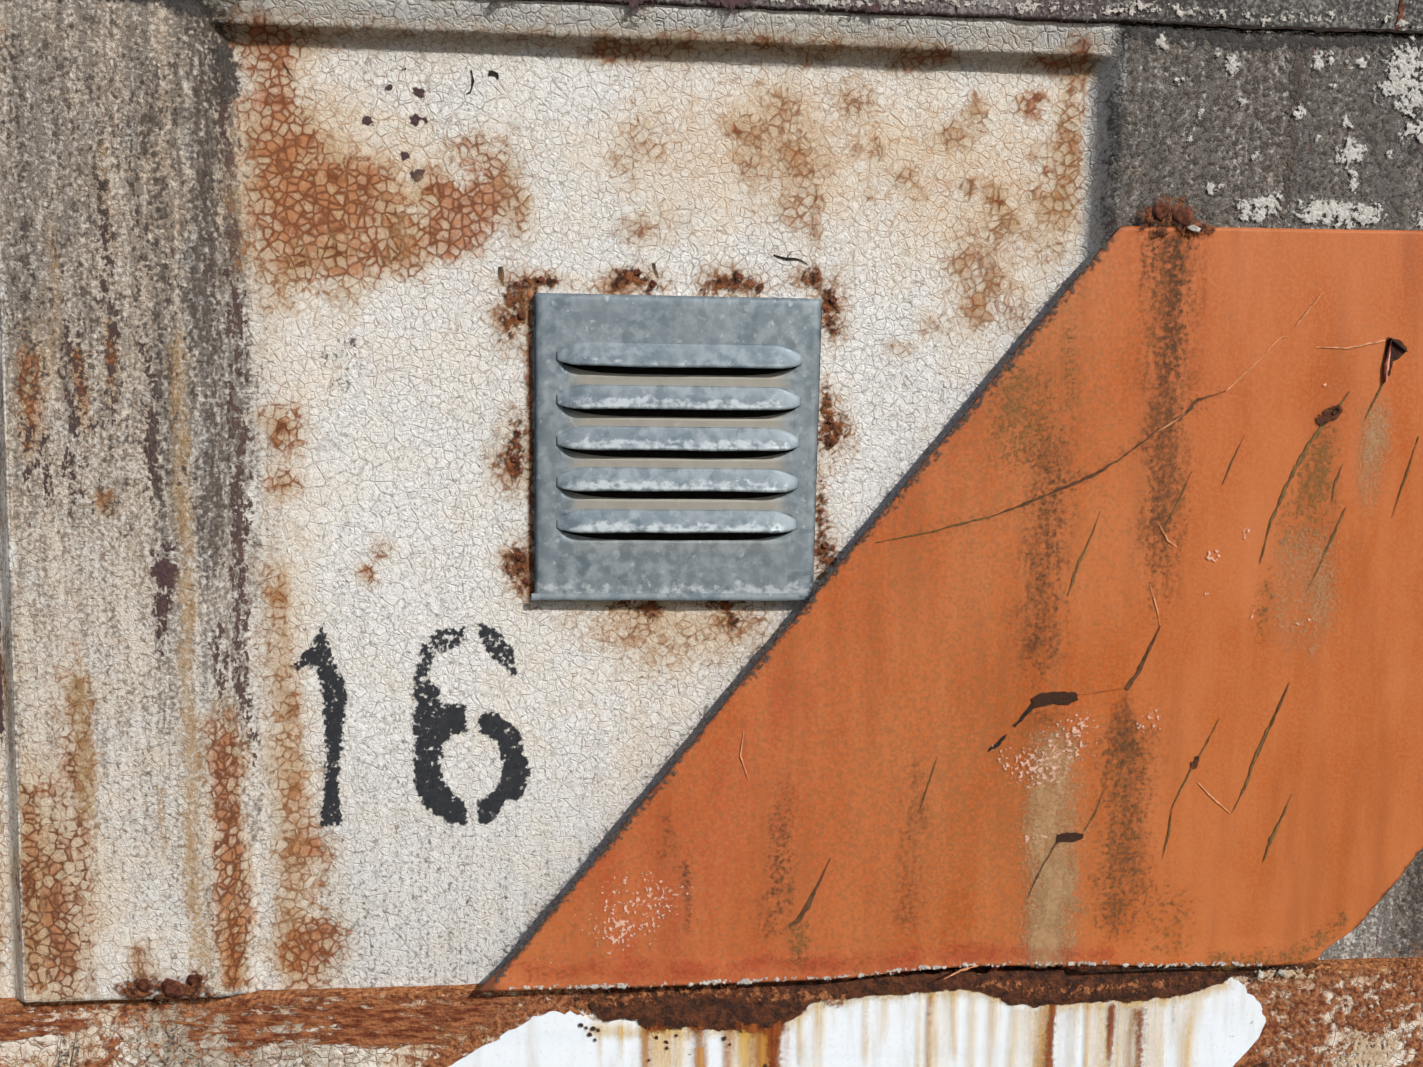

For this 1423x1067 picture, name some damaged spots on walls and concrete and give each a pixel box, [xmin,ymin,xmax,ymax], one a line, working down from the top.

water stain [0,3,242,587]
corrosion [227,11,530,309]
crack [774,251,808,265]
corrosion [787,265,848,346]
water stain [1123,24,1423,219]
corrosion [485,266,572,608]
corrosion [814,386,857,582]
crack [876,336,1288,543]
peeling [495,238,1317,990]
corrosion [0,560,1423,1067]
crack [988,703,1034,752]
crack [1027,791,1104,898]